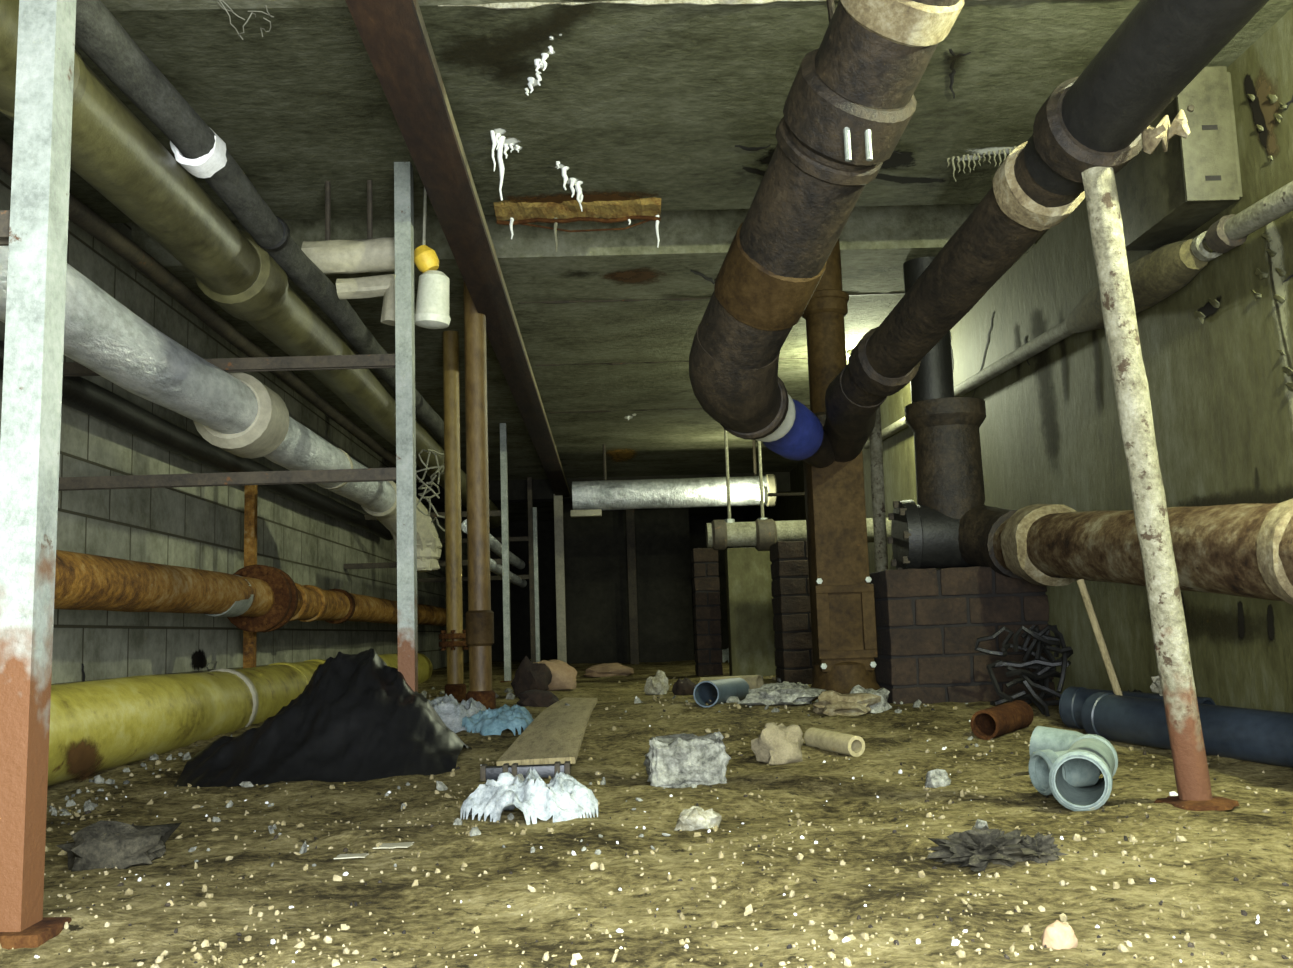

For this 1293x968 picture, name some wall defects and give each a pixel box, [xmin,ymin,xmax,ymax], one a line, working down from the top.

leakage [443,0,596,95]
leakage [490,128,522,201]
leakage [556,161,583,212]
leakage [947,146,1017,182]
leakage [1180,468,1293,507]